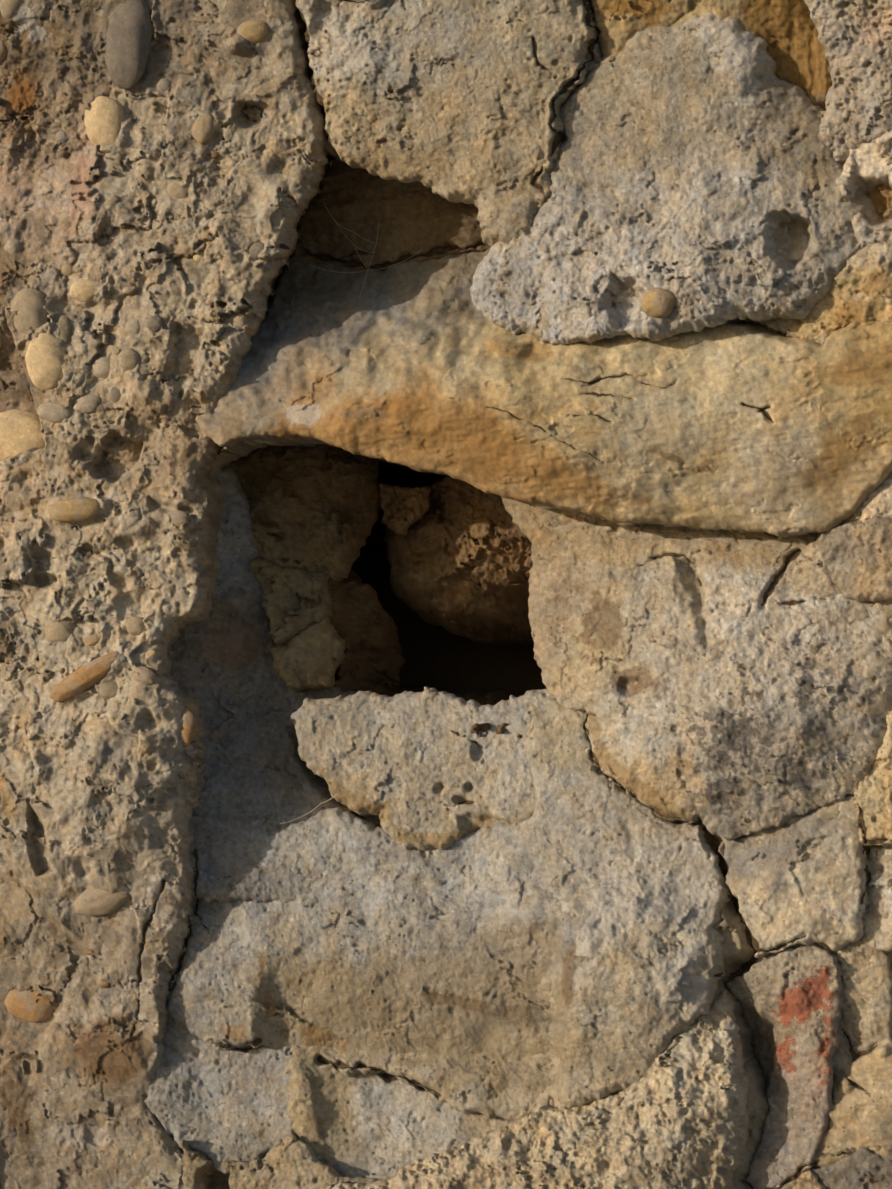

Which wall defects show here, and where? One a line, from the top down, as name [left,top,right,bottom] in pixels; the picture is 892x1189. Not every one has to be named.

crack [294,9,331,142]
crack [532,0,600,193]
crack [761,549,826,606]
crack [132,849,208,1032]
crack [214,1038,262,1052]
crack [317,1055,441,1097]